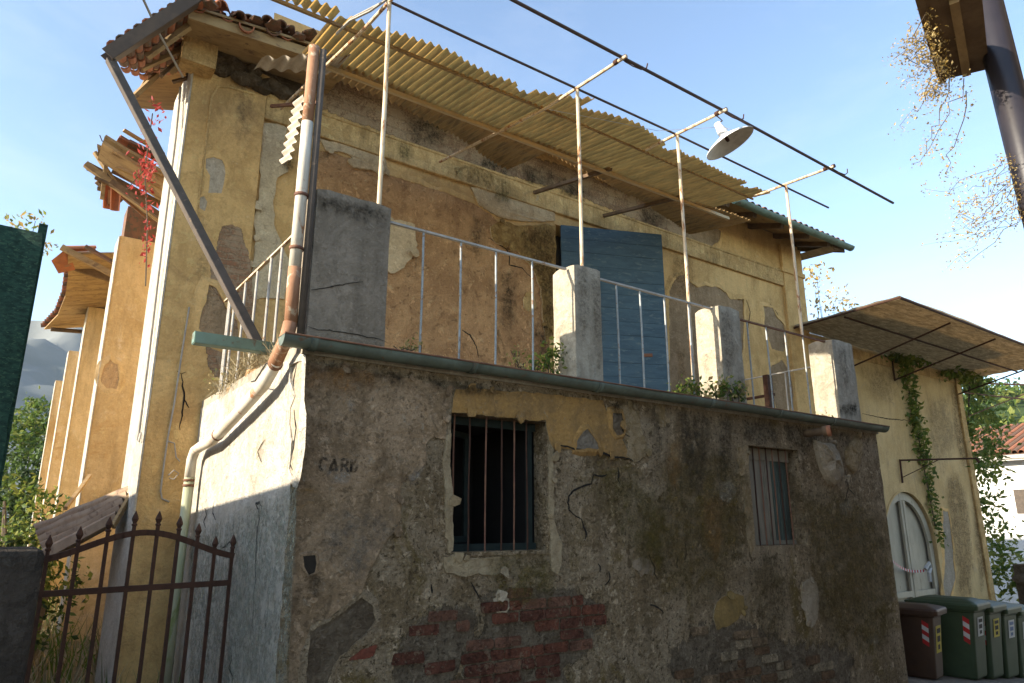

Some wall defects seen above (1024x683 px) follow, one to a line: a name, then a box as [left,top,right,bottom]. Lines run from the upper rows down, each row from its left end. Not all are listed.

flaking render [191,70,723,377]
crack [177,371,189,428]
crack [308,326,386,342]
flaking render [665,269,794,411]
flaking render [287,354,654,683]
crack [561,409,633,541]
leakage [605,414,746,599]